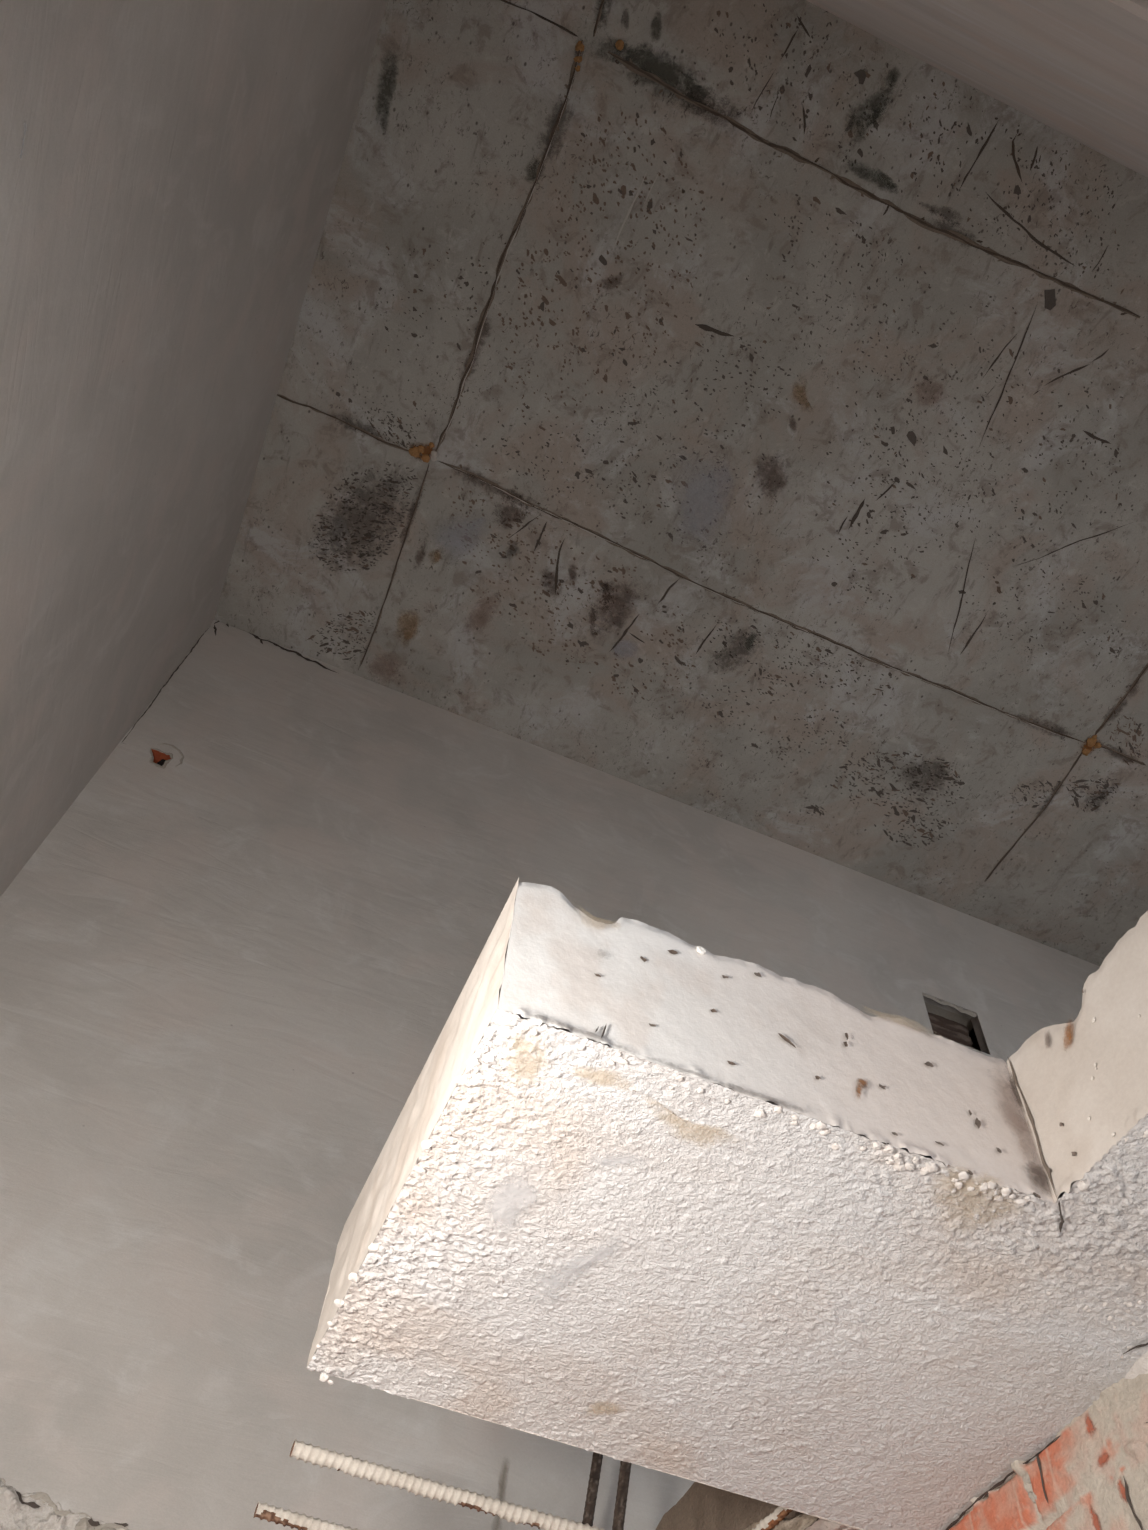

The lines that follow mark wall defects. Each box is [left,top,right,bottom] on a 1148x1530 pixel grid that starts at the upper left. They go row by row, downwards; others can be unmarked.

damp [601,11,703,92]
damp [846,68,898,140]
rust [409,442,438,463]
rust [1081,734,1101,756]
flaking render [0,1478,129,1530]